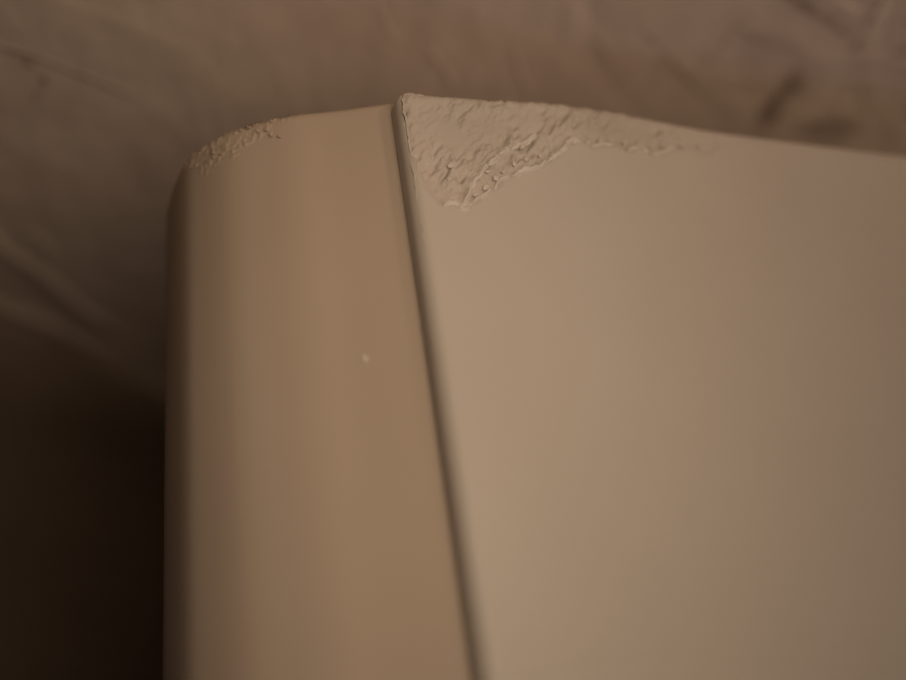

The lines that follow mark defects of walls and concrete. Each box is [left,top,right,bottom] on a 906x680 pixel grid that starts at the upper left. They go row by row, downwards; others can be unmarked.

spalling [401,93,721,248]